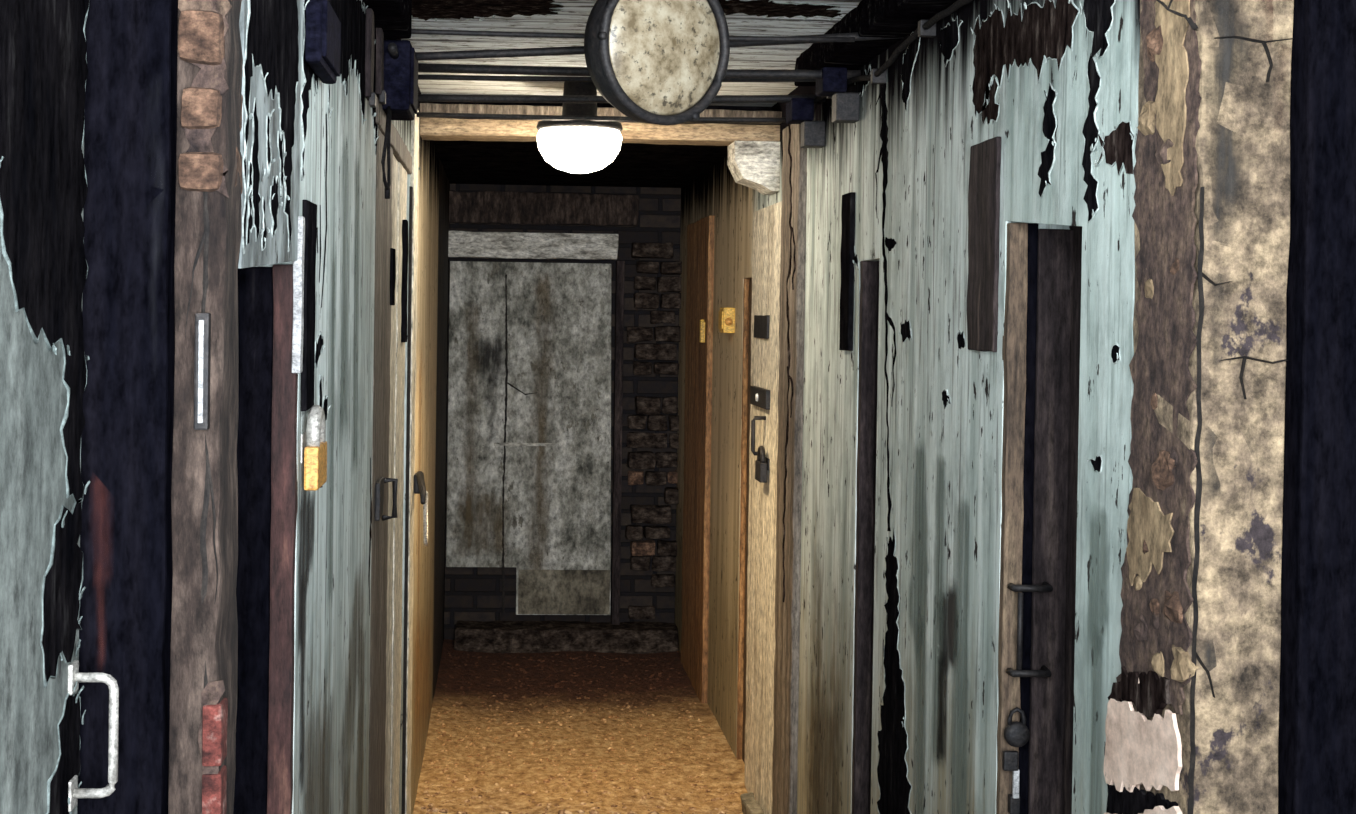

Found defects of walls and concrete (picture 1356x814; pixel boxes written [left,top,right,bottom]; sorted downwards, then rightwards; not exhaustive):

spalling [177,0,378,254]
peeling [901,32,921,112]
peeling [0,0,90,688]
peeling [899,319,912,343]
spalling [939,0,1202,716]
crack [1187,187,1287,814]
peeling [46,682,86,814]
spalling [1106,770,1178,814]